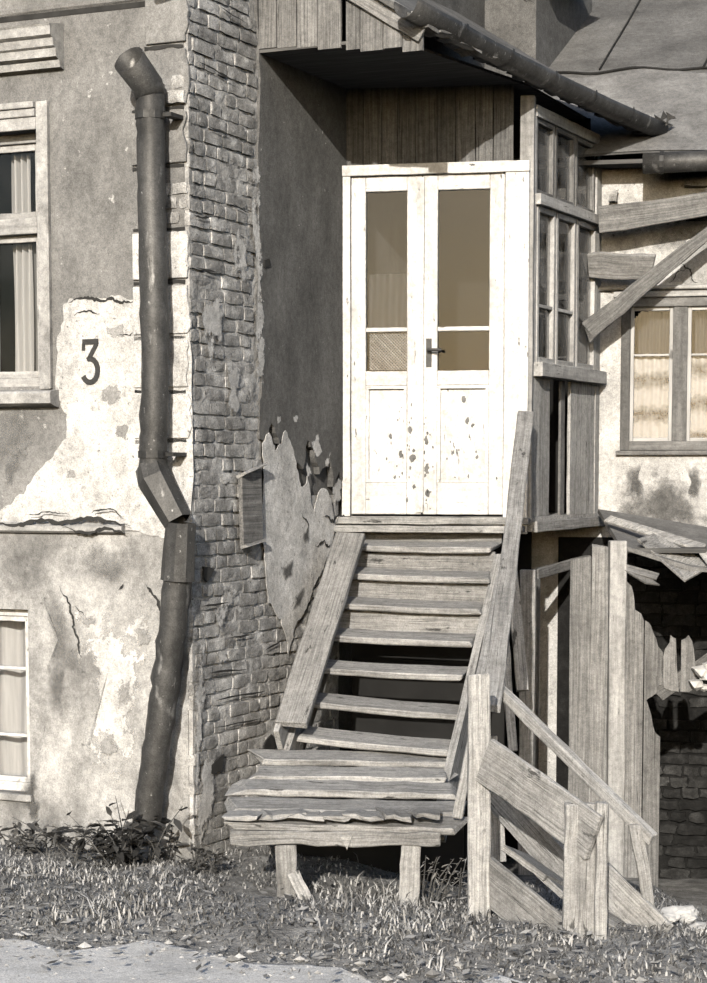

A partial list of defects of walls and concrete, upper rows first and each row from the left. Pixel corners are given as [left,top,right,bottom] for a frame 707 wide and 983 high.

crack [60,588,84,659]
flaking render [0,295,165,538]
crack [118,585,160,611]
flaking render [167,332,194,523]
spalling [262,416,342,654]
leakage [627,470,699,524]